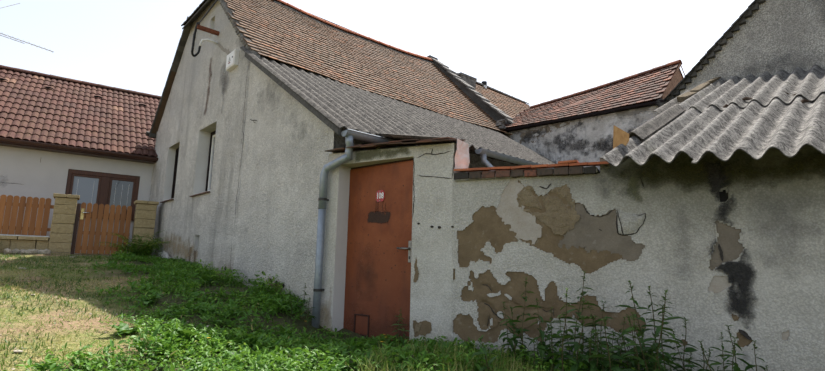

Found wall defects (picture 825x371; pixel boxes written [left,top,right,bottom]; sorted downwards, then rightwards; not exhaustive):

damp [522,129,613,155]
spalling [413,320,432,337]
spalling [451,178,646,343]
damp [705,163,755,347]